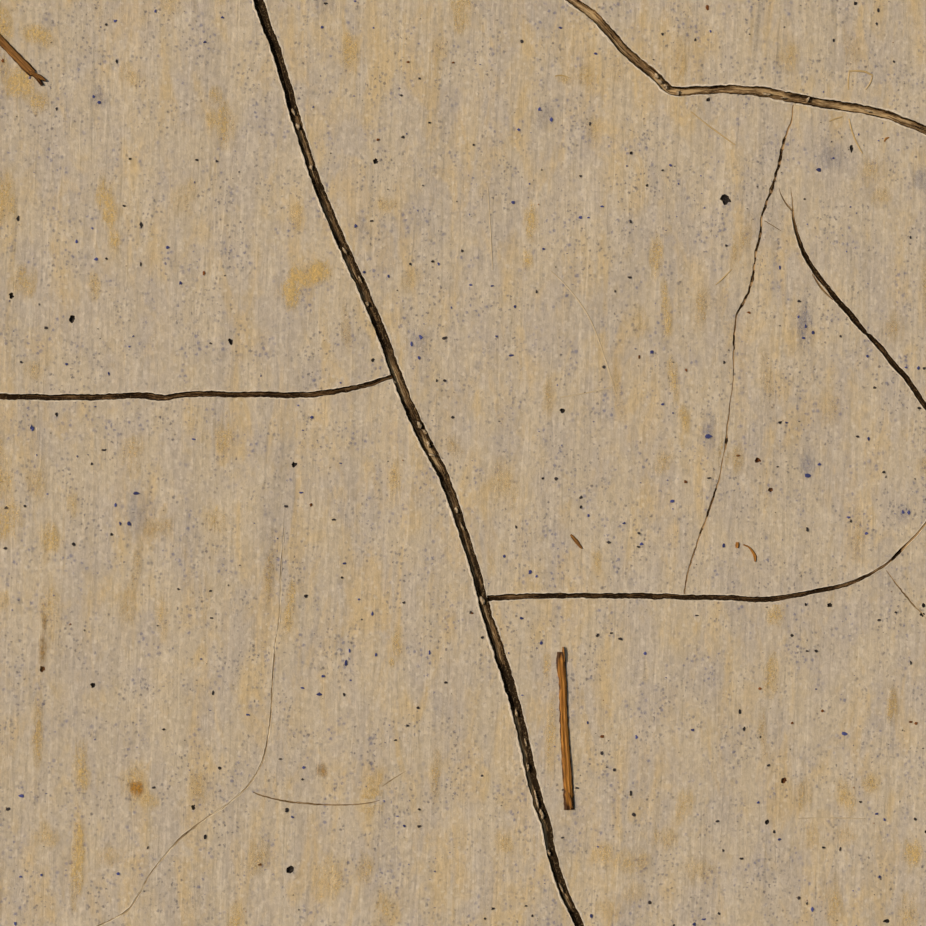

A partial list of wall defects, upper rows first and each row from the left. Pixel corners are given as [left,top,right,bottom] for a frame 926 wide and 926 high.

crack [0,0,586,926]
crack [487,520,926,603]
crack [564,0,926,594]
crack [886,570,923,614]